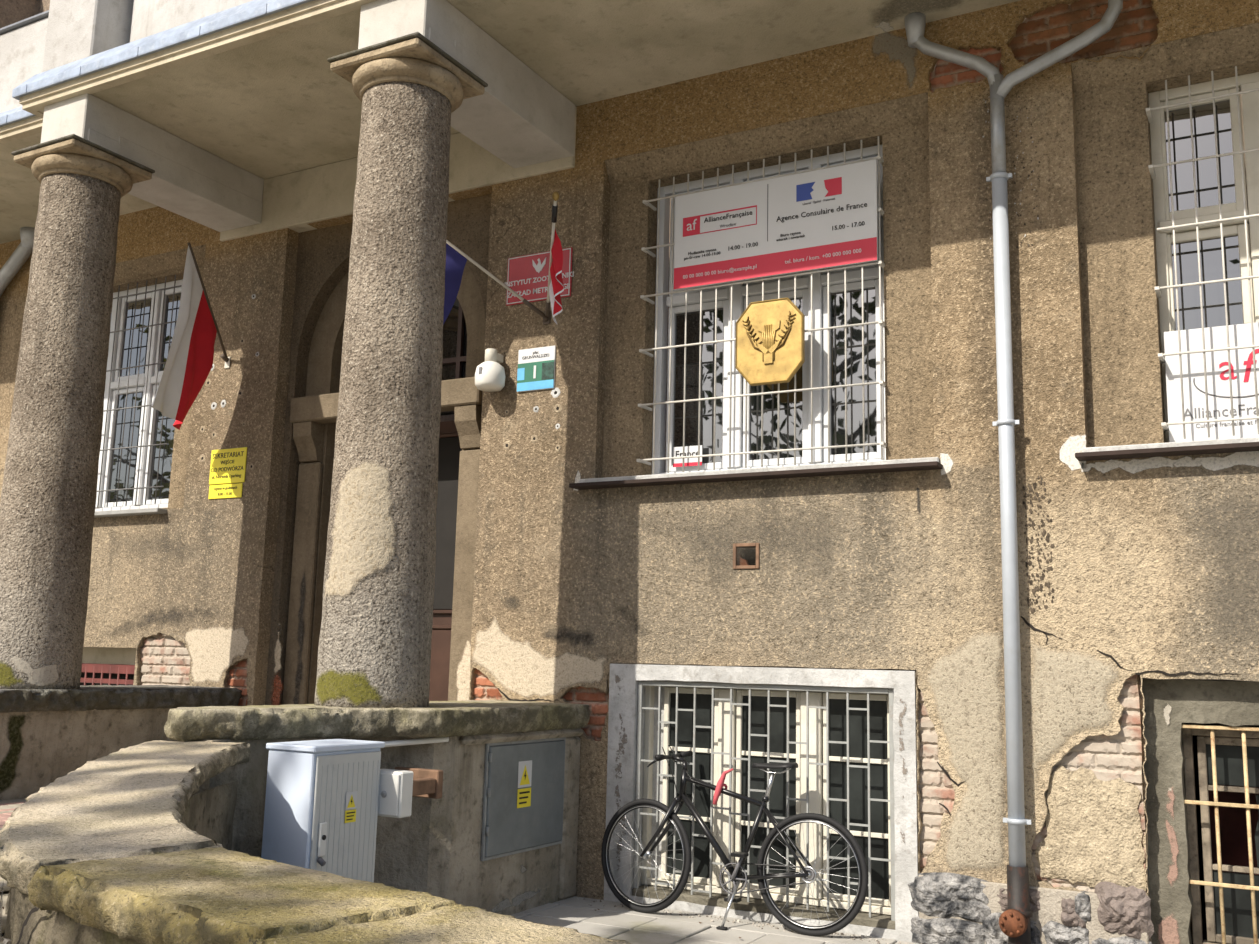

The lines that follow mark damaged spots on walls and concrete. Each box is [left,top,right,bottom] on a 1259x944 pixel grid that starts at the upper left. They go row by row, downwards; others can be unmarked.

spalling [927,0,1161,94]
flaking render [325,462,395,596]
flaking render [136,627,249,706]
crack [1021,616,1062,643]
crack [1097,650,1234,676]
damp [0,715,25,793]
flaking render [457,618,627,870]
spalling [899,669,956,873]
spalling [1029,671,1149,896]
peeling [1166,788,1179,884]
peeling [1158,916,1180,944]